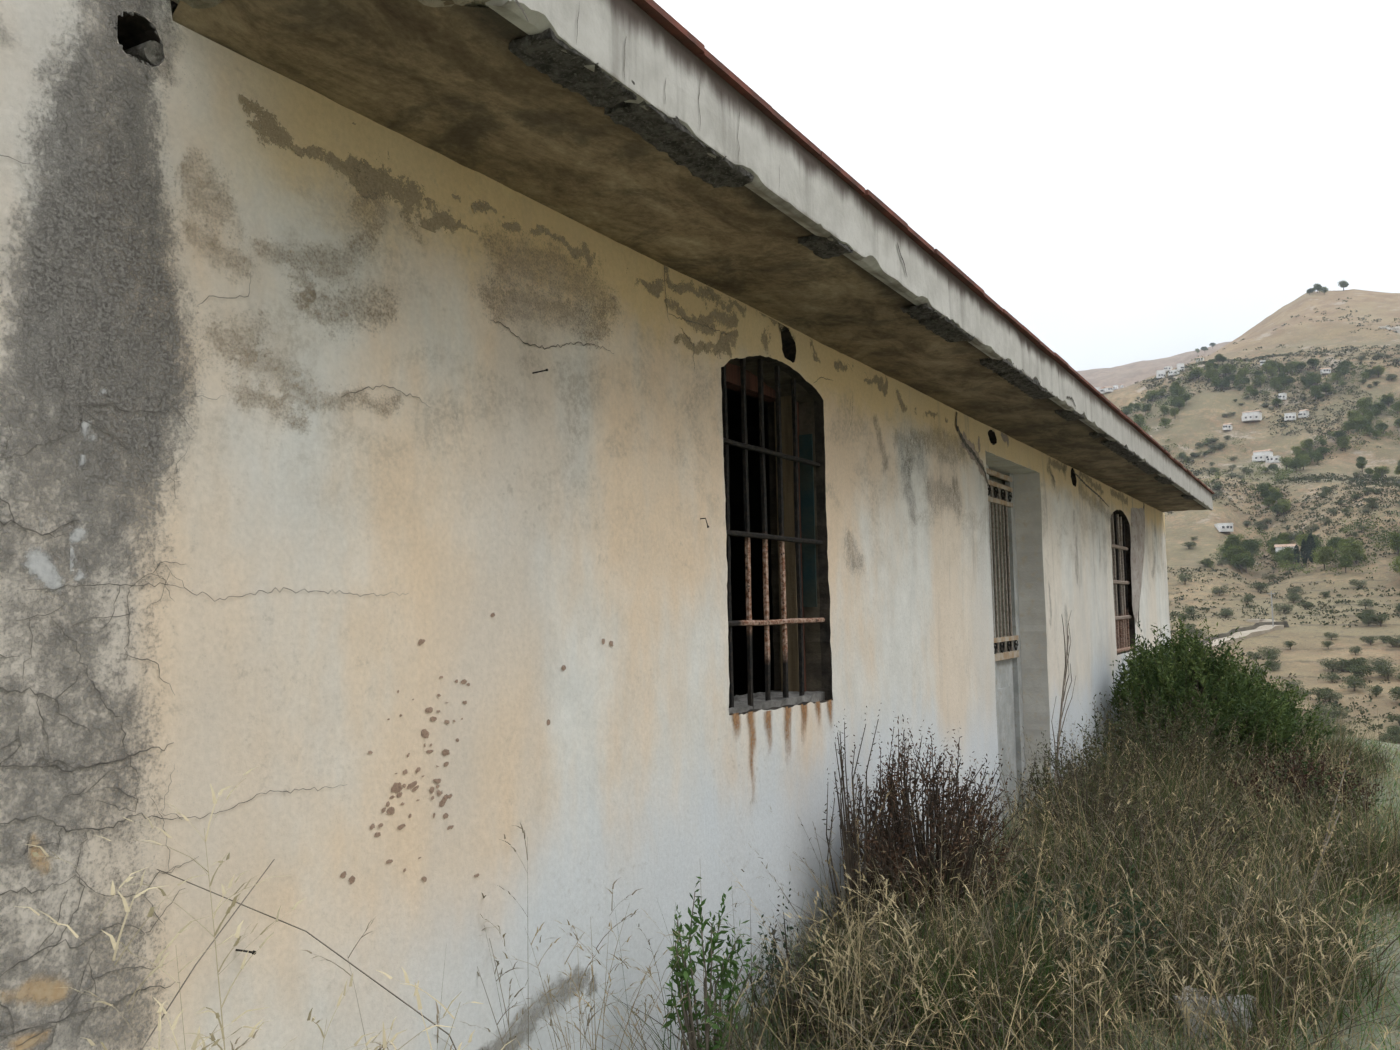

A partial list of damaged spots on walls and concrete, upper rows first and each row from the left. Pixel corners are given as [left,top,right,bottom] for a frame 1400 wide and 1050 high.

spalling [508,28,754,188]
peeling [181,94,616,339]
spalling [798,234,853,259]
peeling [627,266,784,358]
spalling [900,303,975,342]
crack [0,361,222,491]
spalling [979,358,1196,500]
crack [0,497,80,538]
leakage [0,0,197,1050]
corrosion [733,700,832,776]
crack [0,561,406,1050]